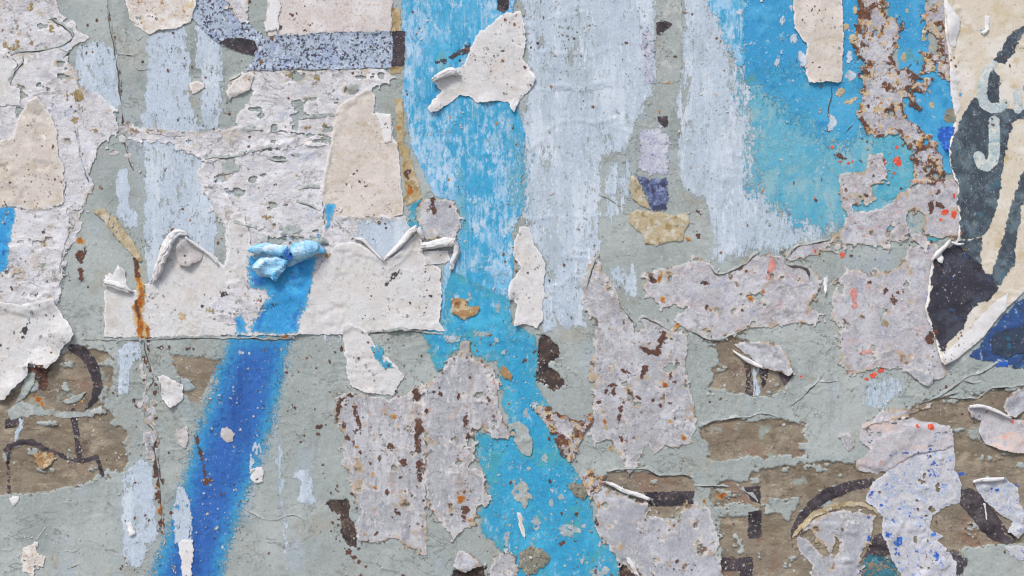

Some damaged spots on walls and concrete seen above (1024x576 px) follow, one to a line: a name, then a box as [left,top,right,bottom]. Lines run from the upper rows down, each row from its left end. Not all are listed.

rust [131,257,170,395]
spalling [549,0,1024,576]
rust [924,170,945,214]
peeling [325,330,568,576]